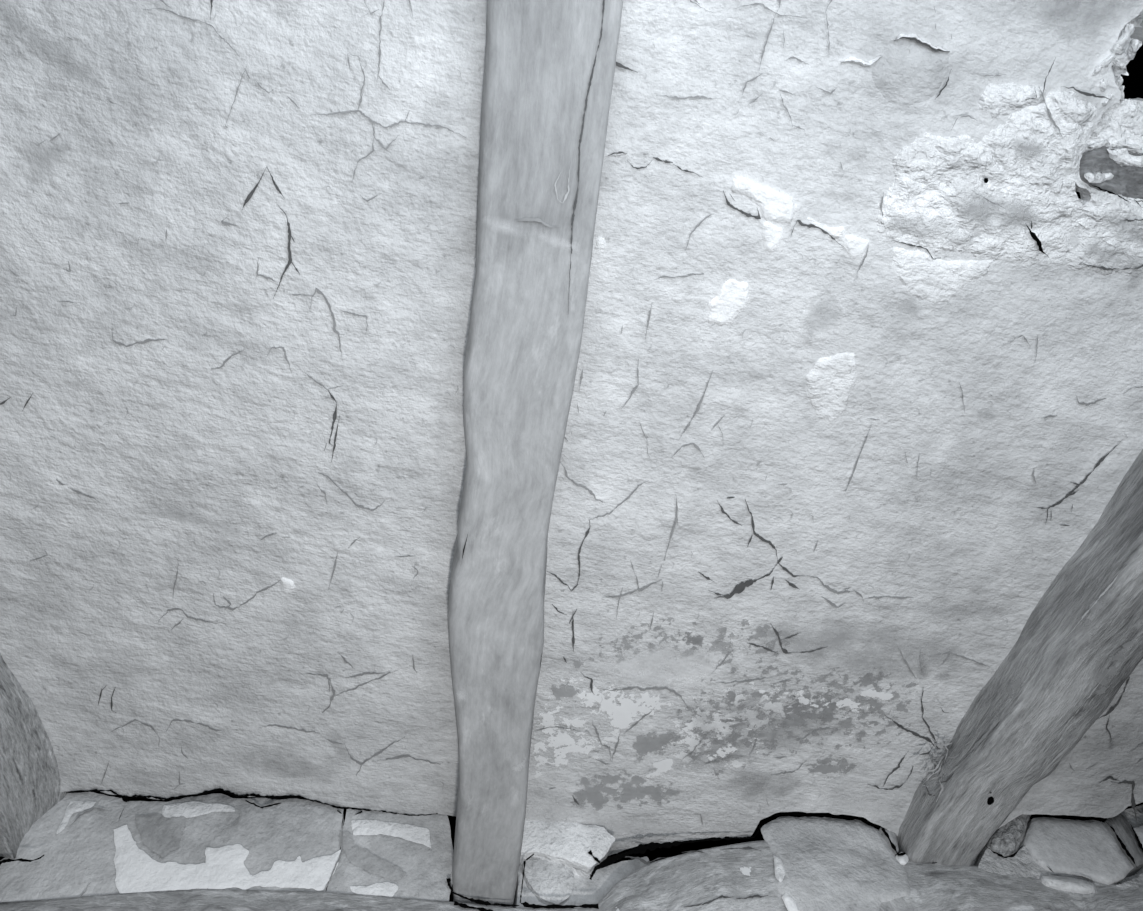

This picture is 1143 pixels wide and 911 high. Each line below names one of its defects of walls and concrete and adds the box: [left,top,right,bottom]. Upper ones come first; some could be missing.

crack [143,0,466,202]
crack [656,0,952,141]
crack [1025,57,1111,138]
spalling [1058,10,1143,263]
crack [221,167,368,356]
crack [791,192,938,274]
crack [214,347,383,511]
crack [535,191,761,765]
crack [699,497,917,608]
peeling [532,676,894,778]
peeling [113,825,341,893]
peeling [350,882,398,897]